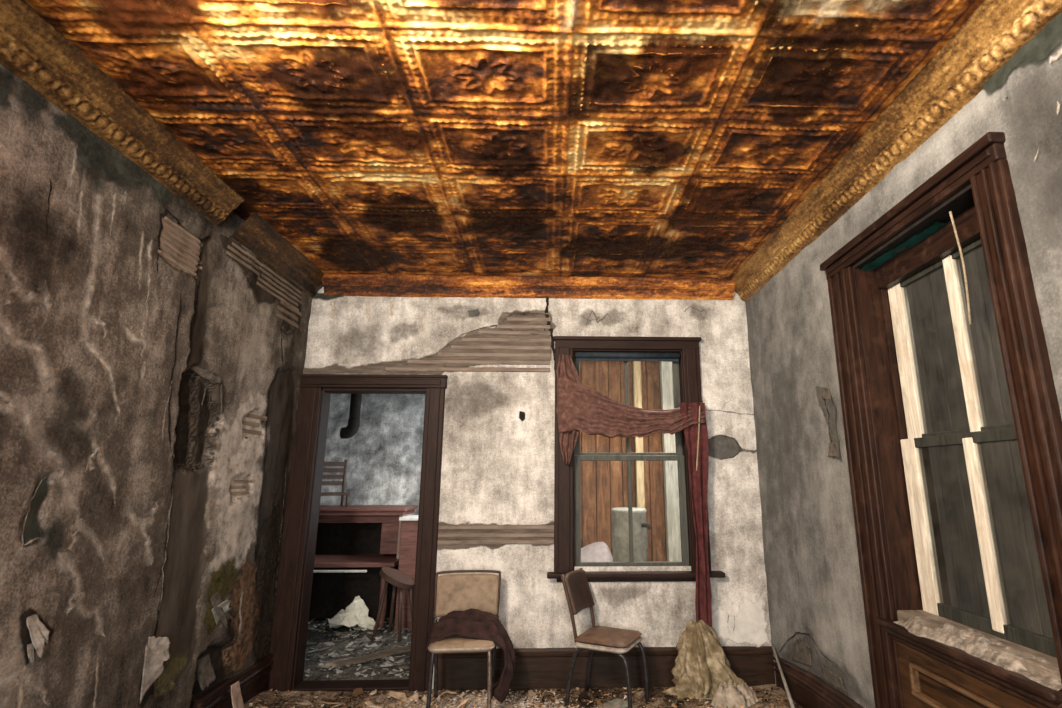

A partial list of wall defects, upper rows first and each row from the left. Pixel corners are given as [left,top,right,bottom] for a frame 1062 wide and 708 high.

rust [273,41,434,156]
rust [566,37,730,119]
rust [749,0,901,125]
damp [0,69,211,415]
rust [559,182,755,263]
flaking render [303,310,556,375]
damp [0,320,116,637]
damp [129,500,159,565]
flaking render [139,363,267,708]
damp [253,368,298,661]
flaking render [437,521,554,550]
peeling [19,608,54,665]